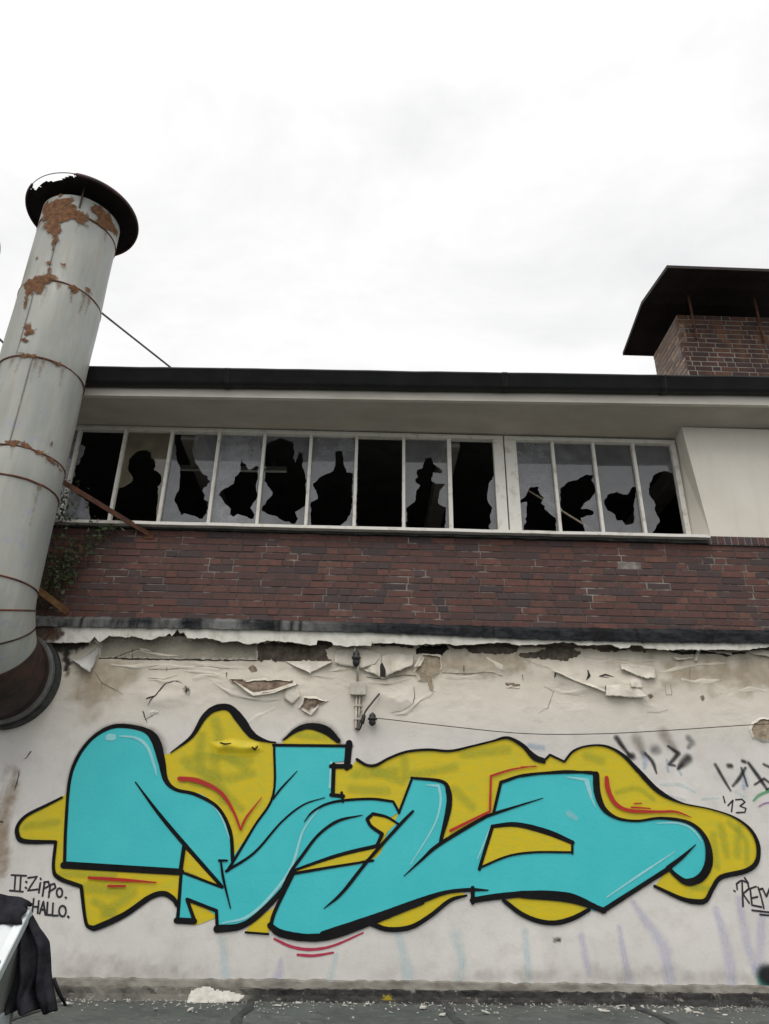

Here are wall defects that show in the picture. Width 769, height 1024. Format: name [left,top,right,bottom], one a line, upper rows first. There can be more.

corrosion [23,194,118,308]
corrosion [0,440,62,472]
peeling [70,638,99,672]
spalling [229,641,656,715]